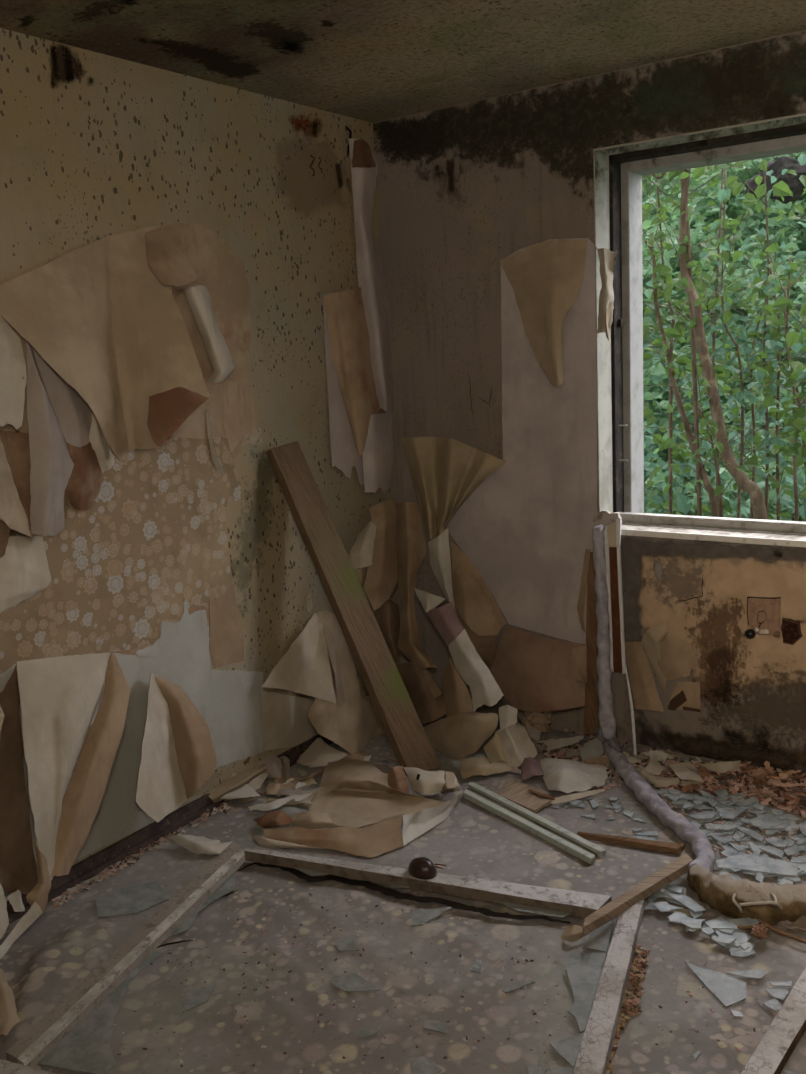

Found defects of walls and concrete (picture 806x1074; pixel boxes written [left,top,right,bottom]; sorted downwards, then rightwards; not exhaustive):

mould [50,44,93,89]
mould [137,38,261,78]
mould [244,19,335,55]
mould [373,31,806,197]
hole [781,617,804,645]
water stain [621,537,806,775]